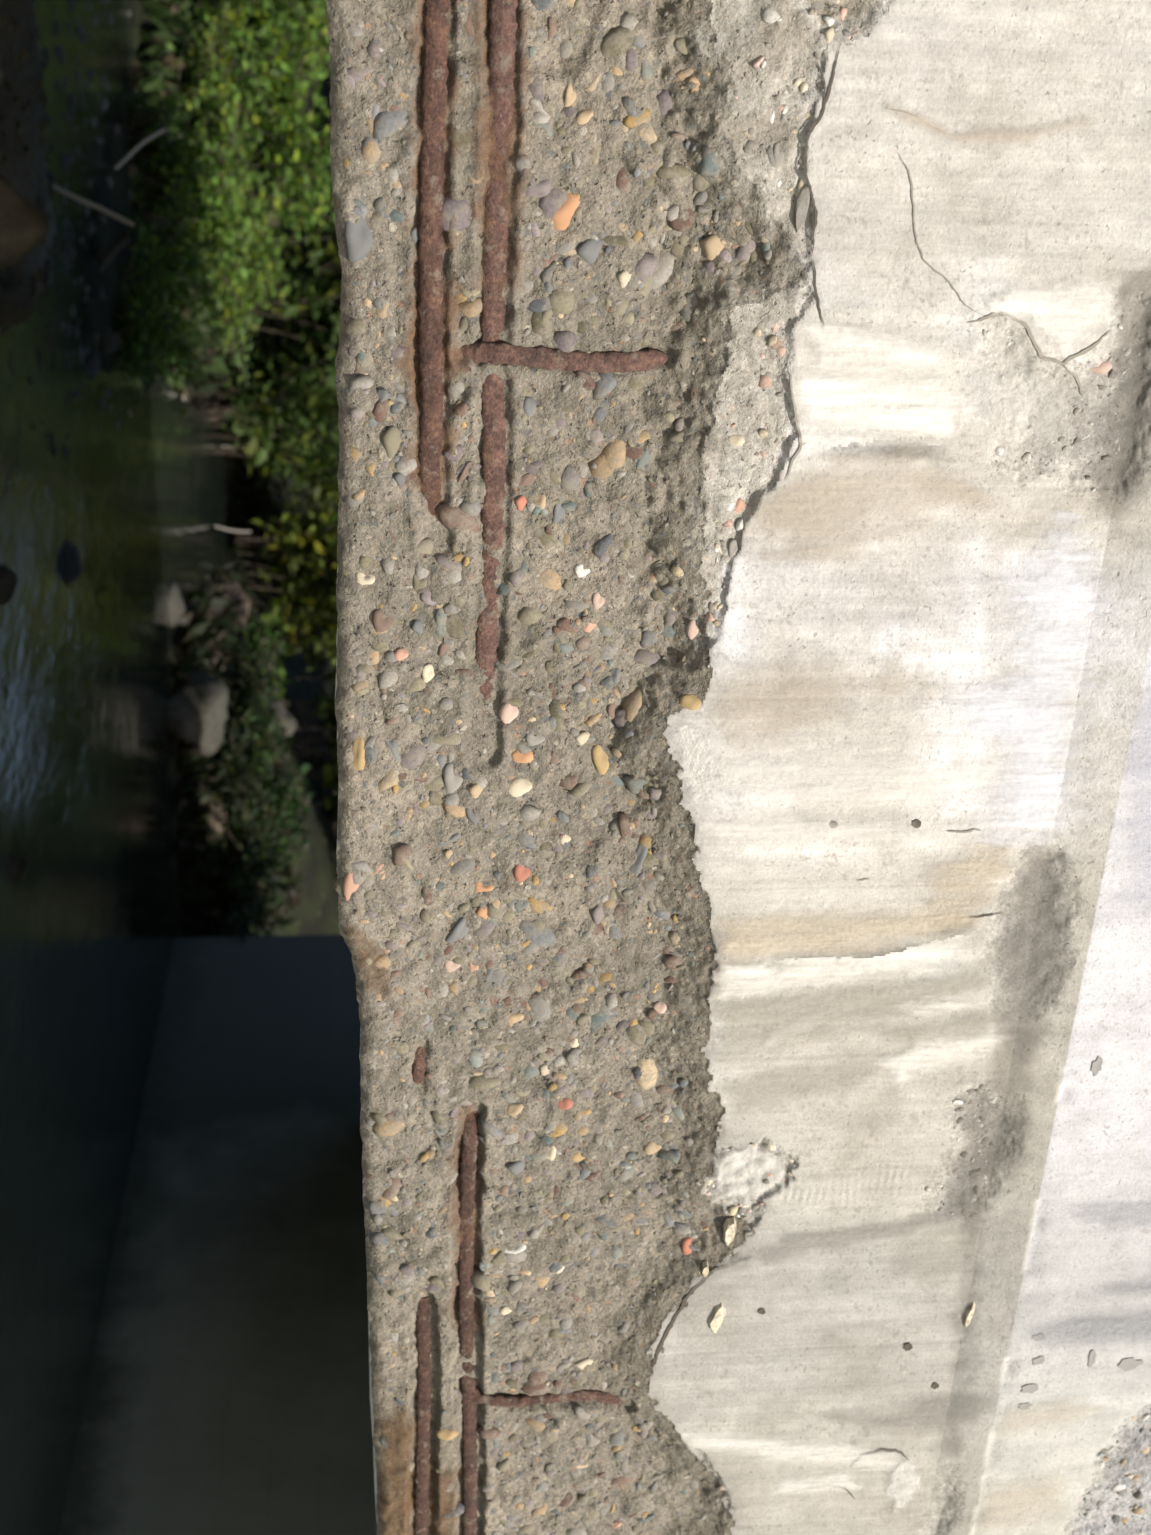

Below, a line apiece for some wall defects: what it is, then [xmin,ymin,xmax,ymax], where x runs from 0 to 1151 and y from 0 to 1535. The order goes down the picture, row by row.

crack [886,108,945,133]
corrosion [404,300,422,399]
corrosion [441,287,466,379]
crack [897,151,1111,397]
damp [990,288,1104,349]
corrosion [440,423,455,478]
spalling [327,0,833,1535]
corrosion [382,1415,453,1535]
spalling [1063,1405,1151,1535]